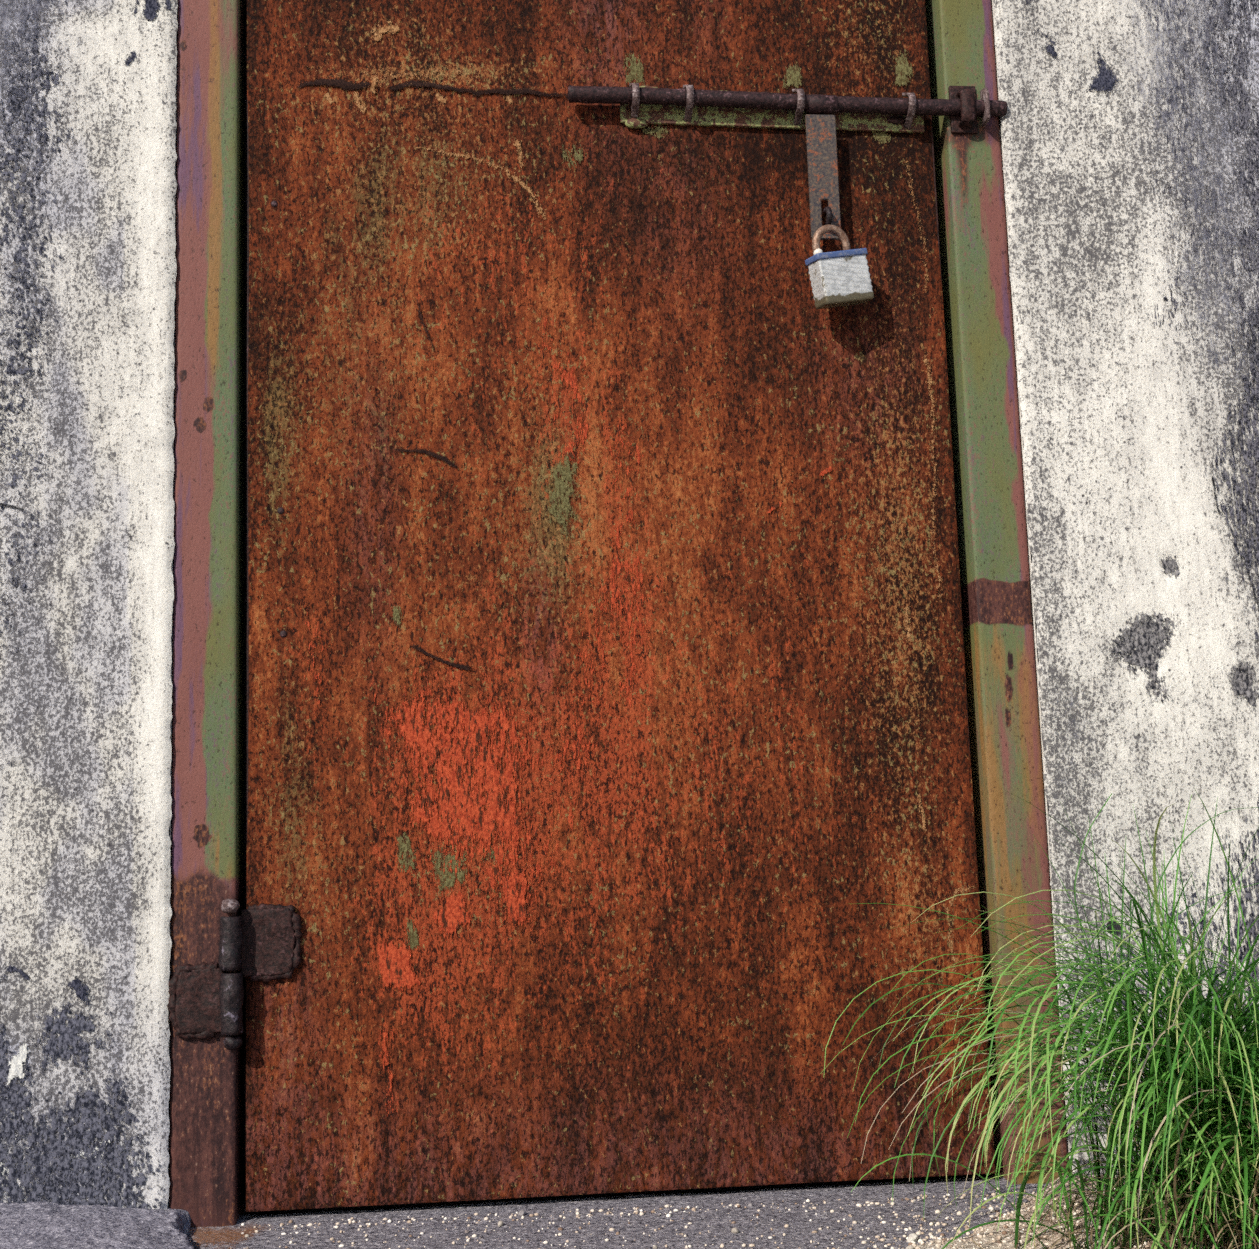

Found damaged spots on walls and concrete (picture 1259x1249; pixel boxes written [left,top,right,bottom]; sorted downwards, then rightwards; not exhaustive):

damp [0,0,77,653]
damp [1145,0,1236,344]